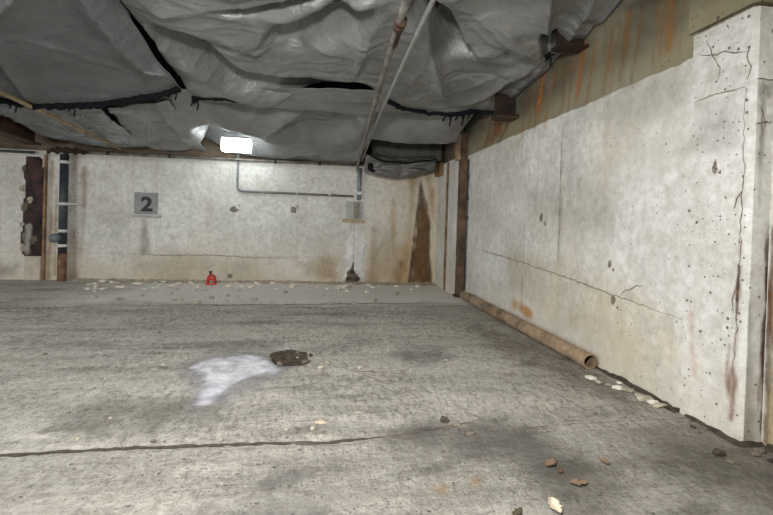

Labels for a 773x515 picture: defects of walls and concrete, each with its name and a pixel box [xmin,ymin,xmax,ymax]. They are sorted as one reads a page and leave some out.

crack [475,207,679,319]
crack [697,40,773,401]
damp [190,355,293,405]
crack [0,418,686,457]